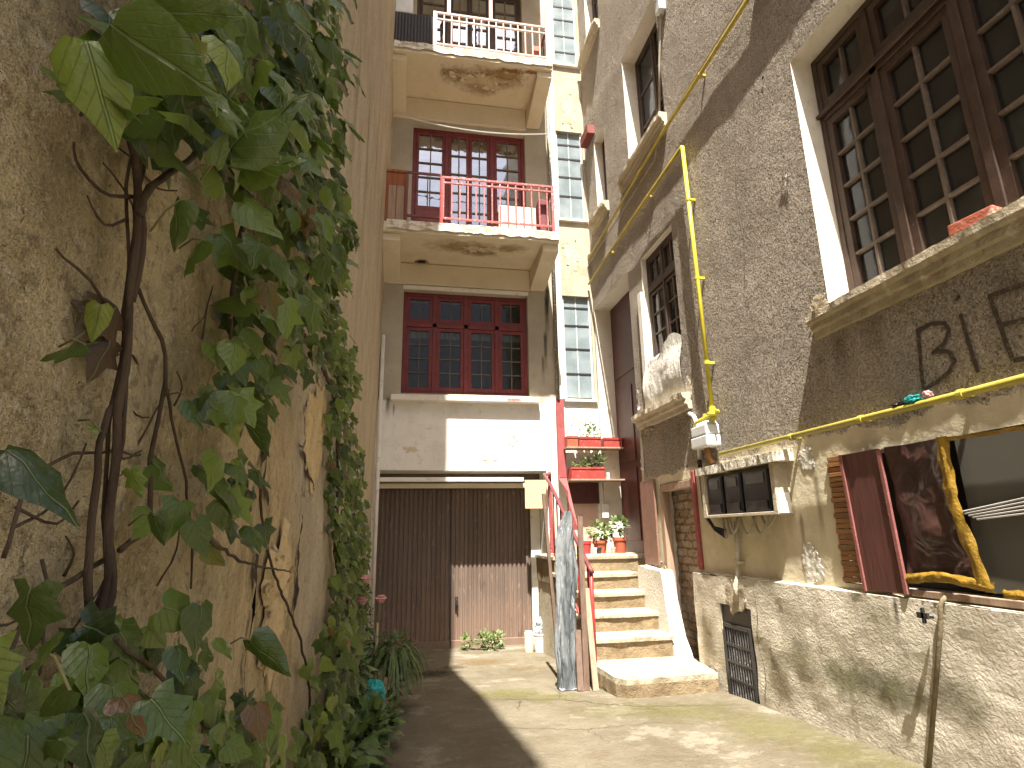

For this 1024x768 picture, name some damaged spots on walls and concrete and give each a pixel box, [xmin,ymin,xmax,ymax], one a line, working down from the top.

spalling [303,374,326,495]
spalling [261,517,296,642]
spalling [258,659,275,698]